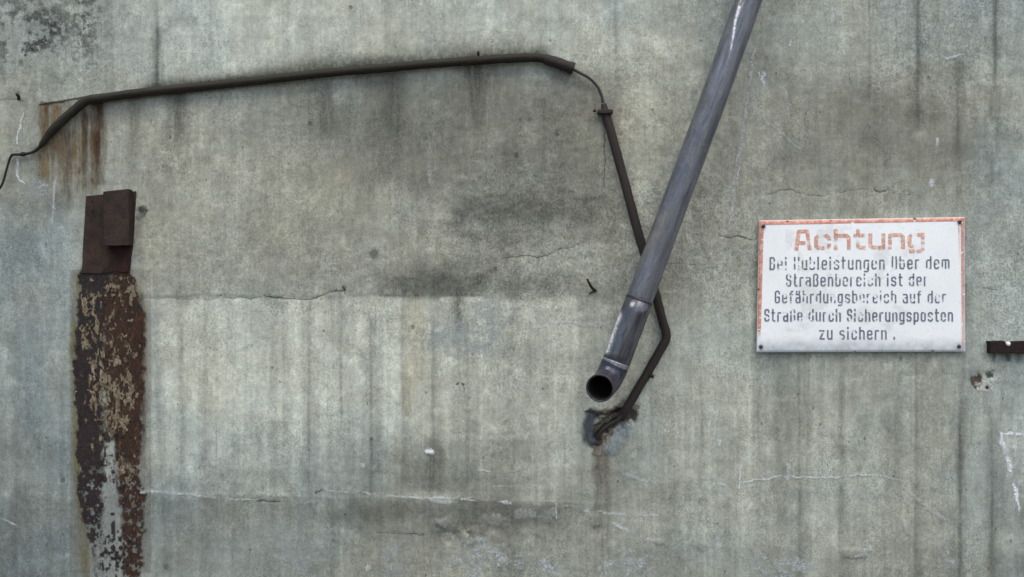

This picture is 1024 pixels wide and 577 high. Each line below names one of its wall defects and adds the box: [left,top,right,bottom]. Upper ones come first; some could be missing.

corrosion [39,96,103,187]
corrosion [70,247,147,577]